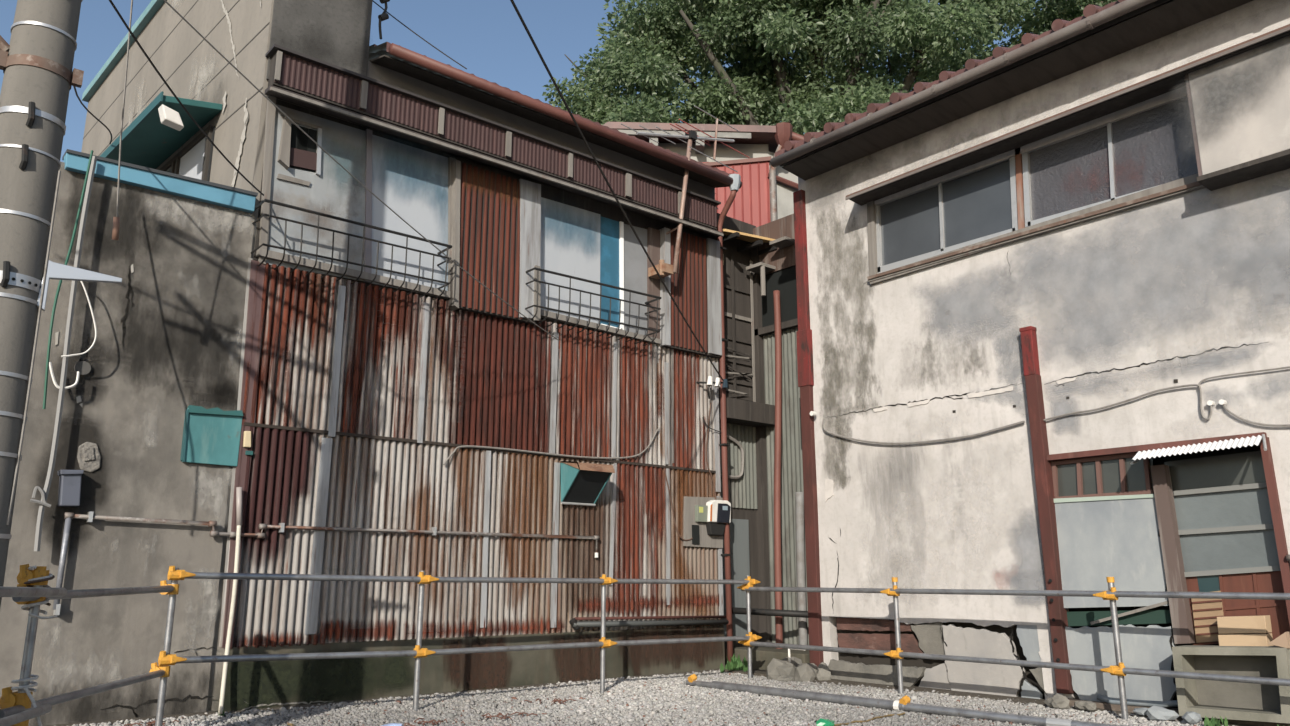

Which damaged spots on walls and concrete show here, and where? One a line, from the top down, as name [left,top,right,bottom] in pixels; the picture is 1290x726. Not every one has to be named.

crack [221,0,248,187]
damp [70,186,251,260]
damp [128,267,241,410]
corrosion [229,263,723,690]
damp [818,214,873,344]
damp [825,345,867,485]
crack [826,342,1267,418]
crack [1010,626,1047,697]